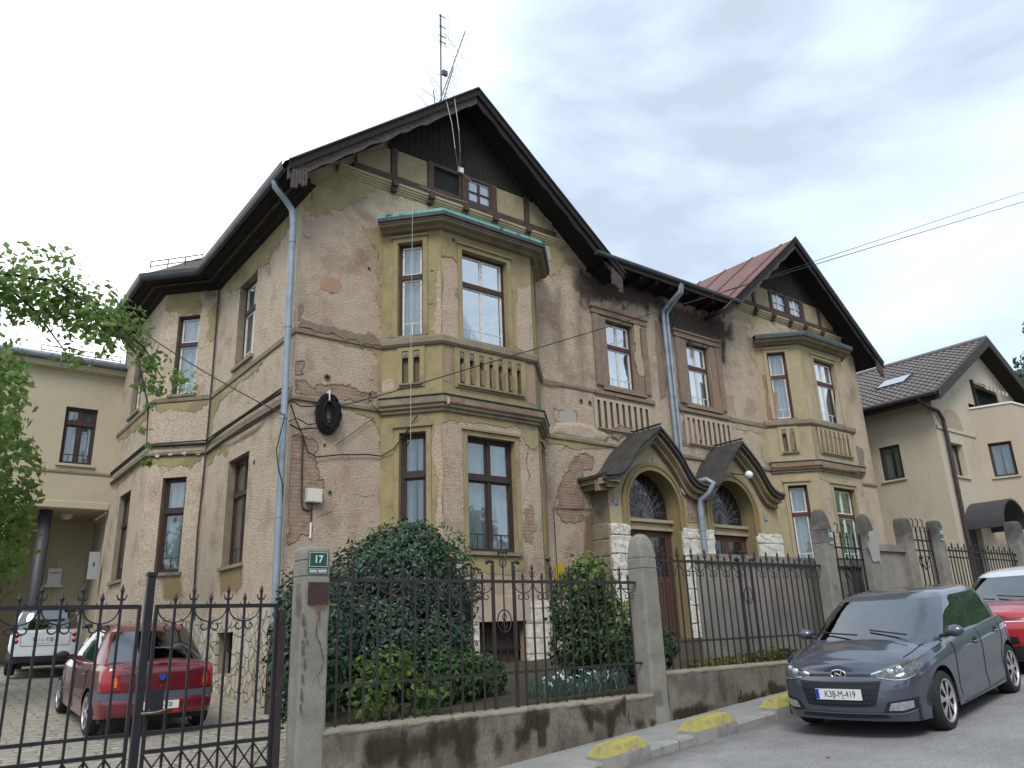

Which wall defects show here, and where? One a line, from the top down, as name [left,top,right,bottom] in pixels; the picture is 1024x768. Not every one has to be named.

peeling [303,170,416,218]
peeling [165,292,217,342]
flaking render [295,225,398,454]
peeling [118,361,262,443]
flaking render [431,285,633,544]
peeling [115,446,228,489]
flaking render [286,433,325,546]
crack [311,610,324,688]
leakage [523,713,548,747]